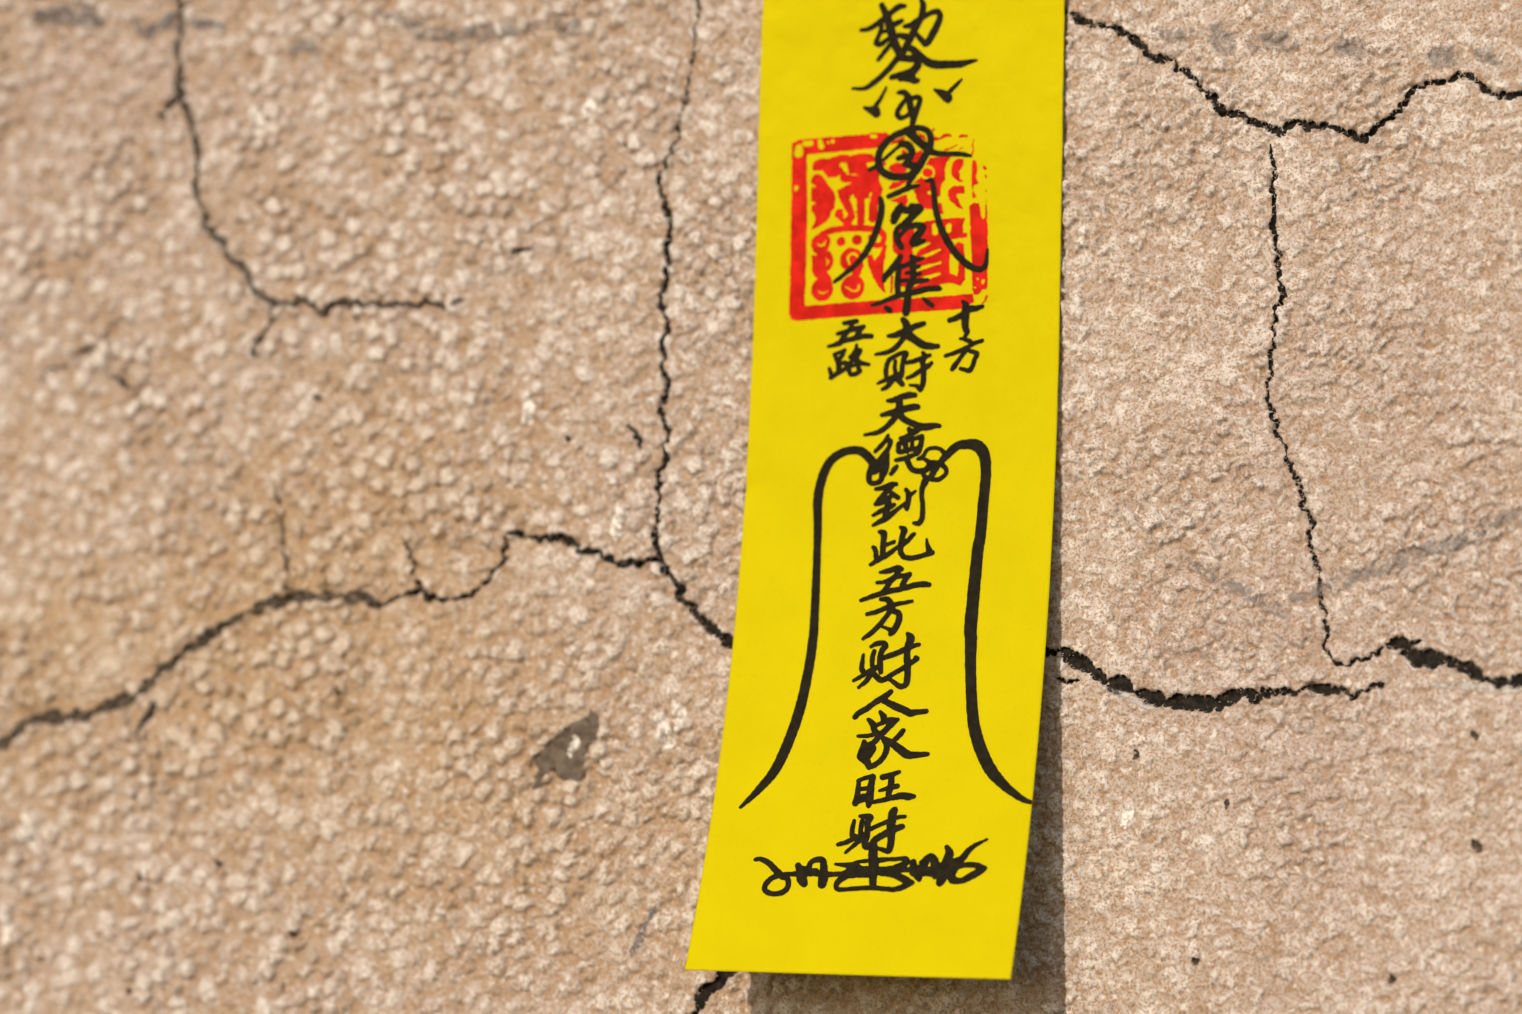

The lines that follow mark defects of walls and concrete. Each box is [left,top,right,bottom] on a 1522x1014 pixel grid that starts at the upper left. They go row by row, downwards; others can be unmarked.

crack [0,0,733,750]
crack [1045,11,1522,713]
crack [692,971,737,1014]